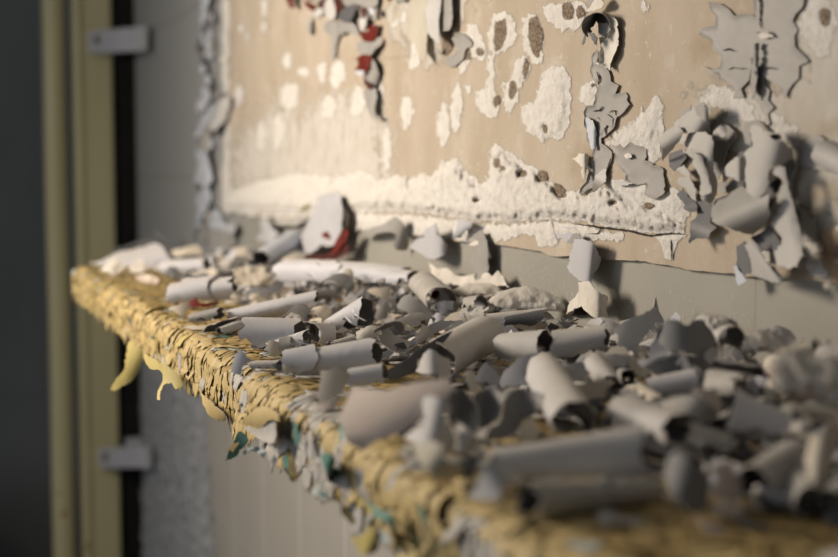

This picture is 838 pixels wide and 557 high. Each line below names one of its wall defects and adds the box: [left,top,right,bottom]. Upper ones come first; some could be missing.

peeling [112,0,245,257]
peeling [213,247,249,274]
peeling [254,0,453,176]
flaking render [247,193,624,280]
peeling [435,0,838,286]
water stain [681,0,838,267]
peeling [71,266,838,557]